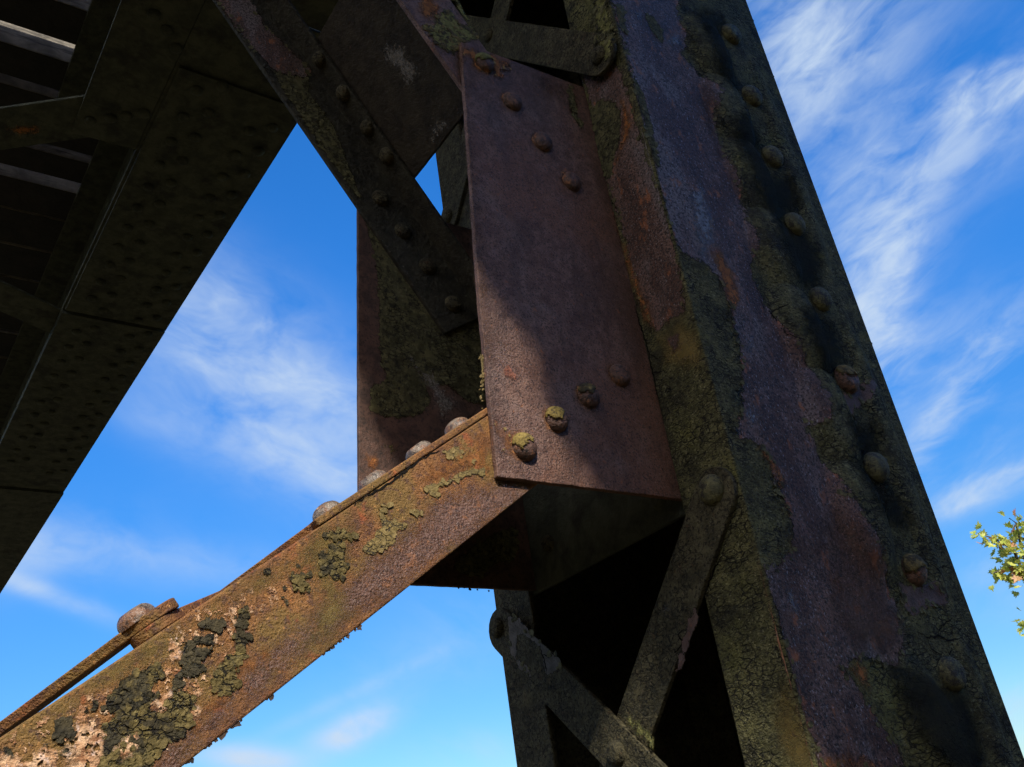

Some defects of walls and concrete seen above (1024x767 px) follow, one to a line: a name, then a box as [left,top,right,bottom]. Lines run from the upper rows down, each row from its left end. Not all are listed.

peeling [508,613,562,677]